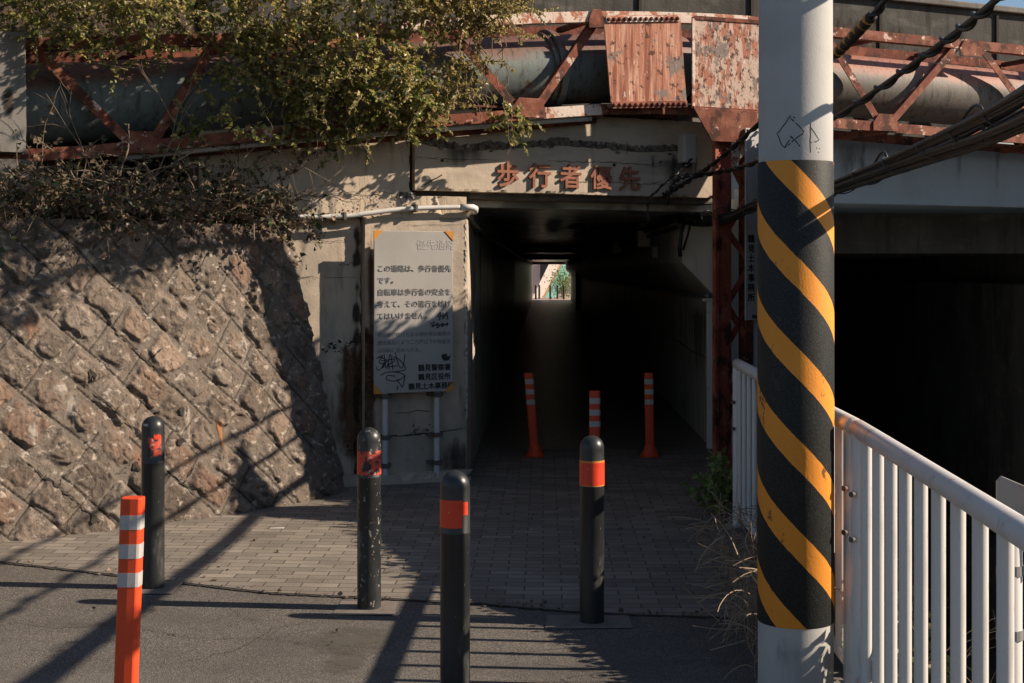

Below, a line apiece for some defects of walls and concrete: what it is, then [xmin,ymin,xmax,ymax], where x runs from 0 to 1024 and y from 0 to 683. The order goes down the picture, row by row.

corrosion [338,254,375,457]